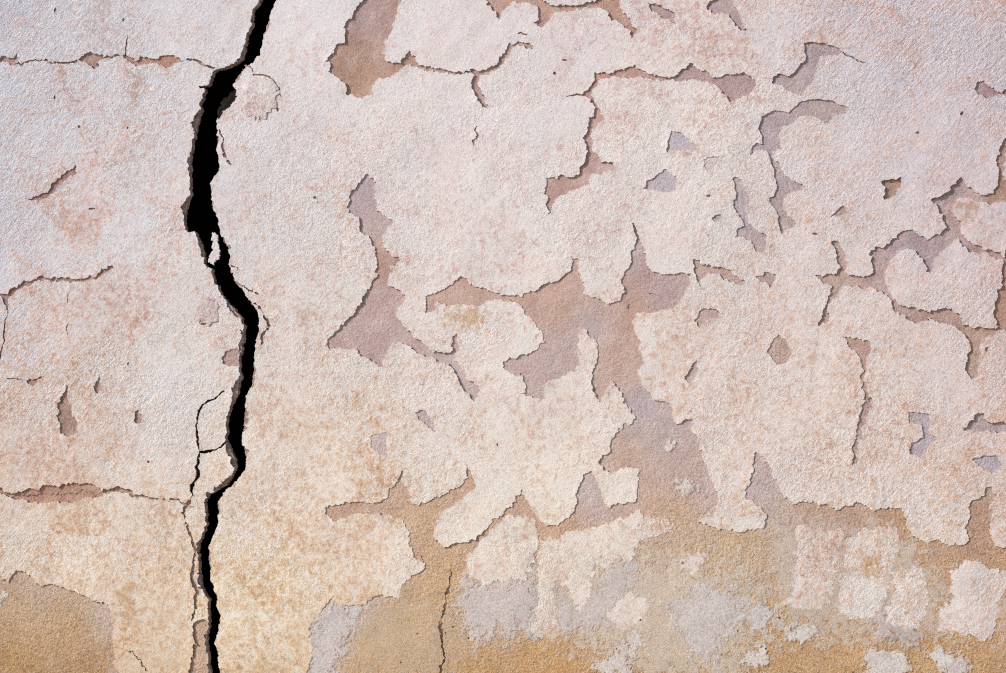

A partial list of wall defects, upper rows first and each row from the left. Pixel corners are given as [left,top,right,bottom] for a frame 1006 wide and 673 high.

crack [0,0,282,673]
peeling [326,174,480,401]
peeling [325,0,533,108]
peeling [486,0,638,38]
peeling [544,63,757,215]
peeling [648,3,676,24]
peeling [707,0,746,31]
peeling [733,177,767,253]
peeling [750,41,866,233]
peeling [815,138,1006,379]
peeling [972,81,1006,98]
peeling [307,223,1006,673]